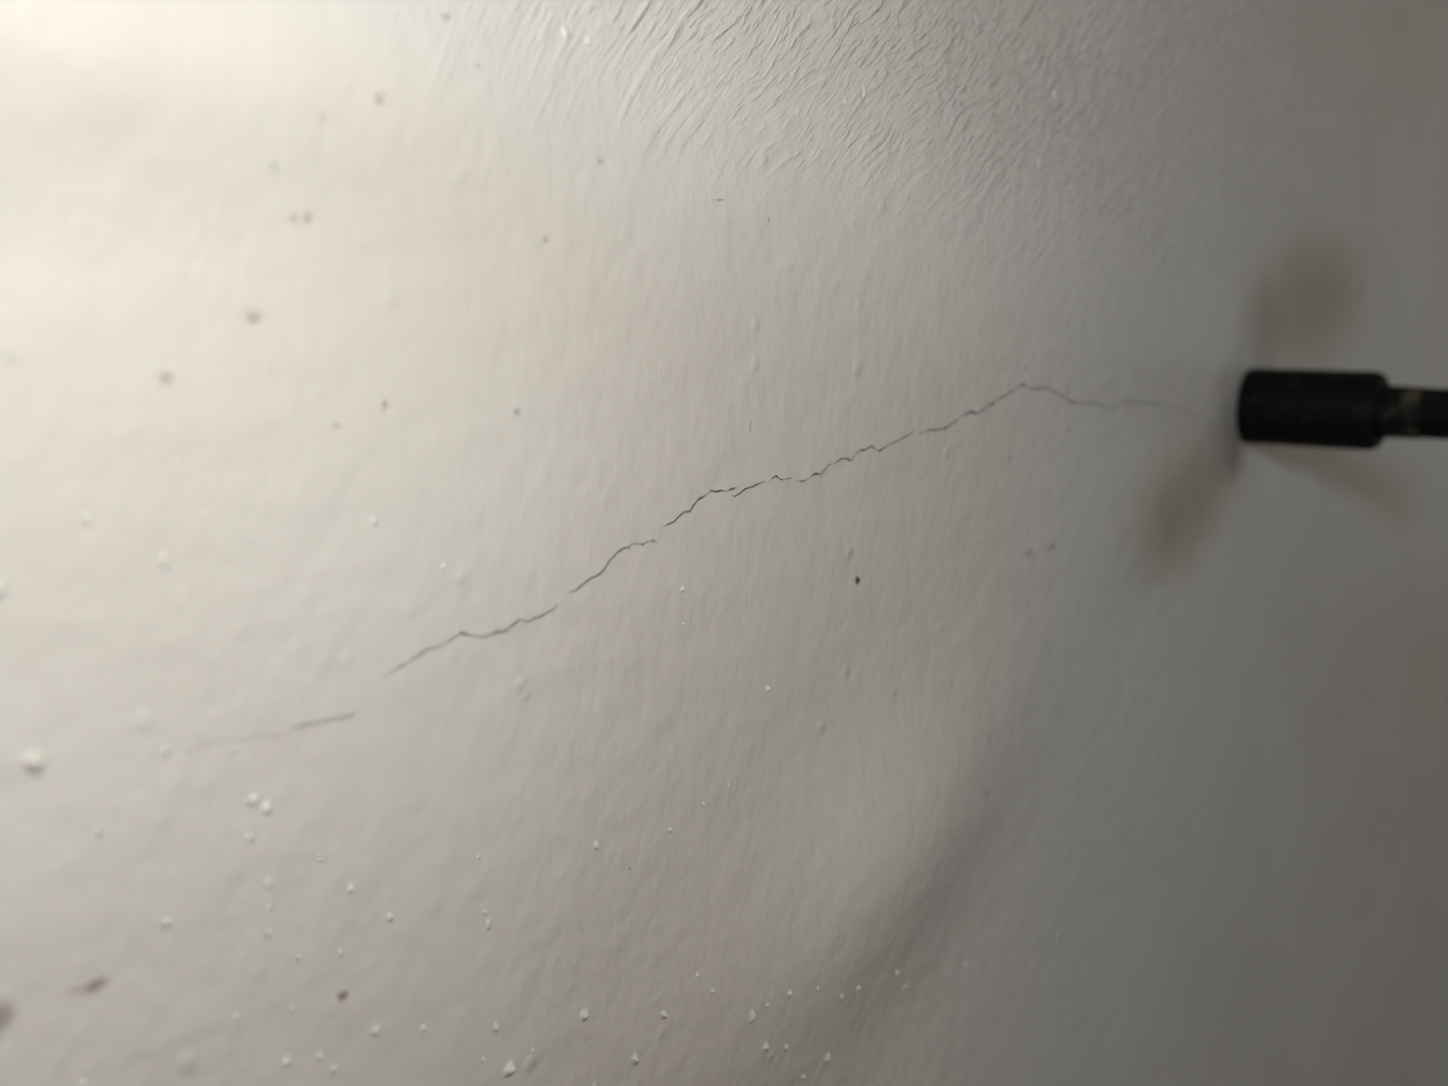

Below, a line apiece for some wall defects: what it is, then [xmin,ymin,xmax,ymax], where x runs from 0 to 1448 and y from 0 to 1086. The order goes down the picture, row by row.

crack [667,442,895,525]